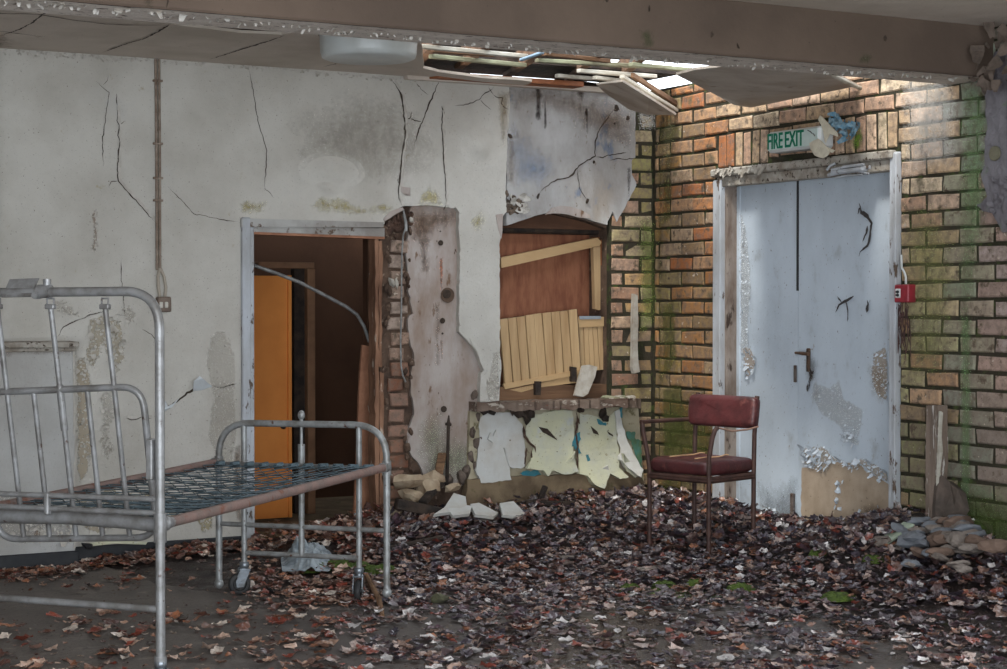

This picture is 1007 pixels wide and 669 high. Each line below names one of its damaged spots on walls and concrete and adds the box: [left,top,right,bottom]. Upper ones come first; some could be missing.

crack [0,0,169,52]
crack [97,79,155,222]
crack [216,36,282,197]
crack [392,77,509,210]
crack [541,112,634,198]
flaking render [977,51,1007,233]
flaking render [382,187,501,514]
peeling [1,524,72,547]
peeling [626,431,642,468]
peeling [797,432,889,527]